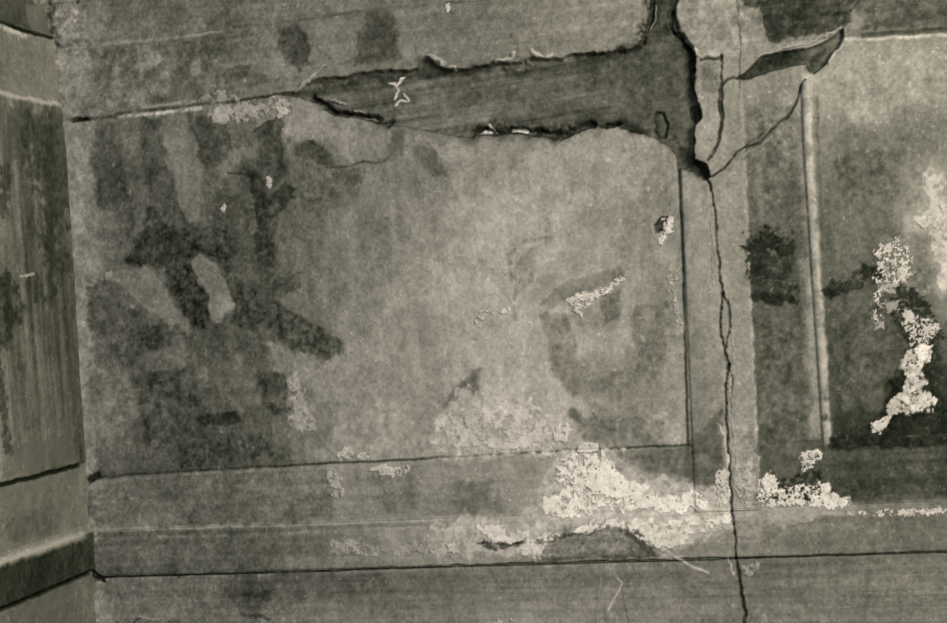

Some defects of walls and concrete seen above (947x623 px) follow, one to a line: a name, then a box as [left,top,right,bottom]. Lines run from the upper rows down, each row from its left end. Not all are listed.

flaking render [285,0,712,181]
flaking render [737,27,850,80]
damp [764,0,848,43]
damp [136,206,188,264]
flaking render [654,217,668,233]
damp [741,225,797,306]
damp [914,168,947,290]
crack [700,34,806,623]
damp [822,237,947,451]
damp [286,370,317,433]
damp [326,471,345,498]
damp [330,384,947,578]